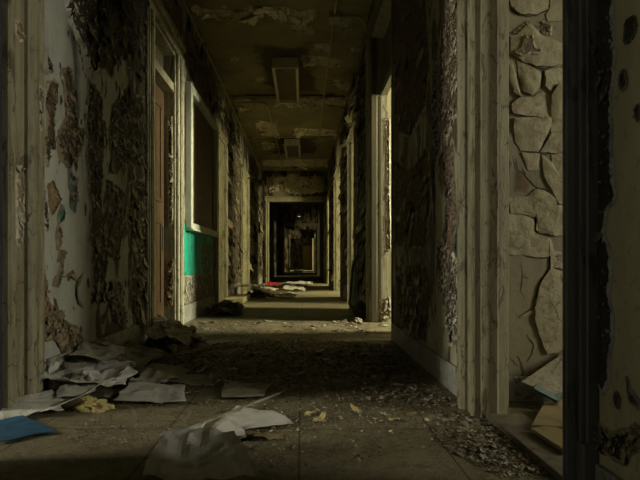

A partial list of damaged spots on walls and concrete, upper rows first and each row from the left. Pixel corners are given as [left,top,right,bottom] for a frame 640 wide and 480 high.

crack [509,1,550,17]
peeling [39,0,154,351]
peeling [161,0,366,305]
peeling [384,0,431,252]
peeling [436,0,457,347]
crack [517,116,552,155]
crack [521,168,558,205]
crack [526,63,557,90]
peeling [593,0,640,412]
peeling [379,263,430,344]
crack [513,213,562,321]
peeling [593,421,640,466]